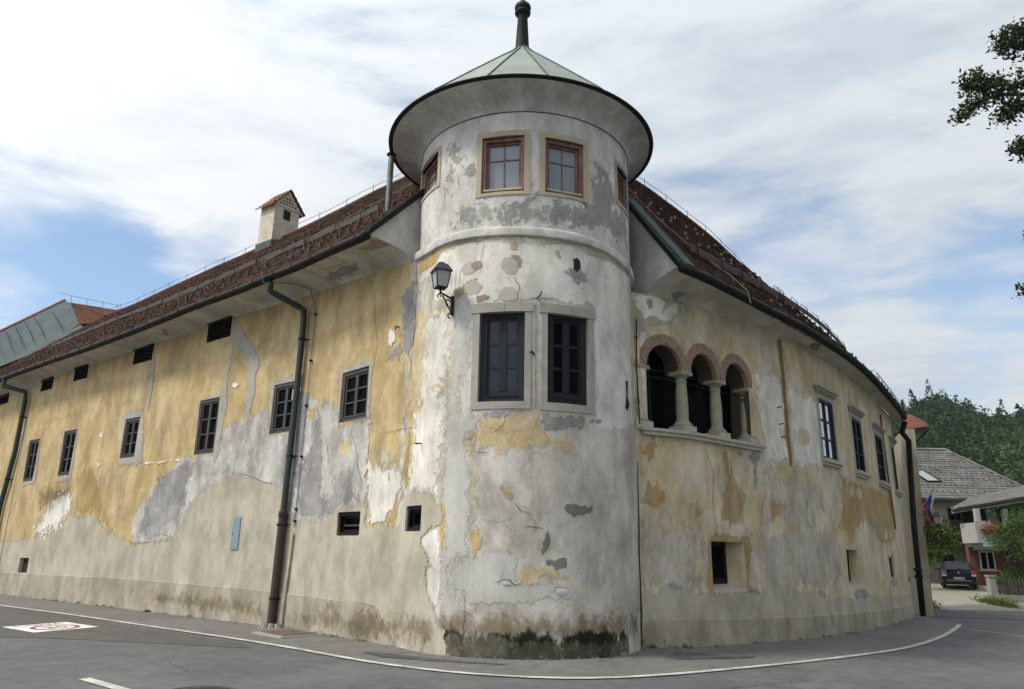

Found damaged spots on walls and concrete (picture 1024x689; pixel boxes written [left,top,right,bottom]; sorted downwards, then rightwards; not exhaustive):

spalling [464,163,476,177]
peeling [131,237,686,606]
peeling [752,366,824,469]
peeling [32,488,75,543]
leakage [155,593,259,614]
leakage [302,605,638,643]